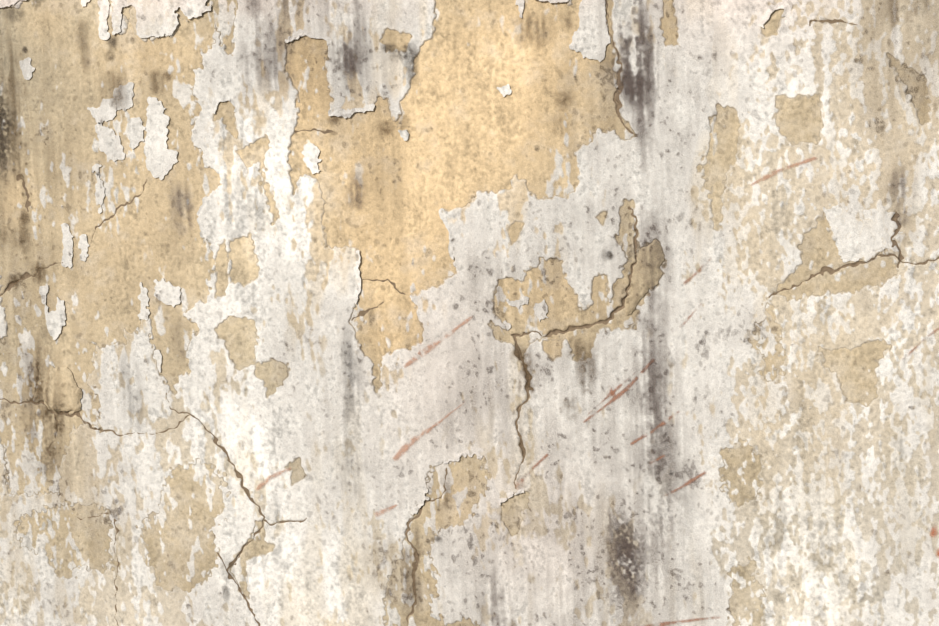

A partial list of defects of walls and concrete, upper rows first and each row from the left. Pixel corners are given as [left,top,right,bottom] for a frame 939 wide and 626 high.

damp [624,24,651,134]
crack [809,18,857,26]
peeling [0,0,288,596]
peeling [285,0,636,392]
crack [511,207,638,489]
peeling [492,200,665,361]
crack [769,212,939,298]
crack [0,363,307,626]
crack [405,468,448,623]
peeling [383,447,529,626]
damp [608,529,637,594]